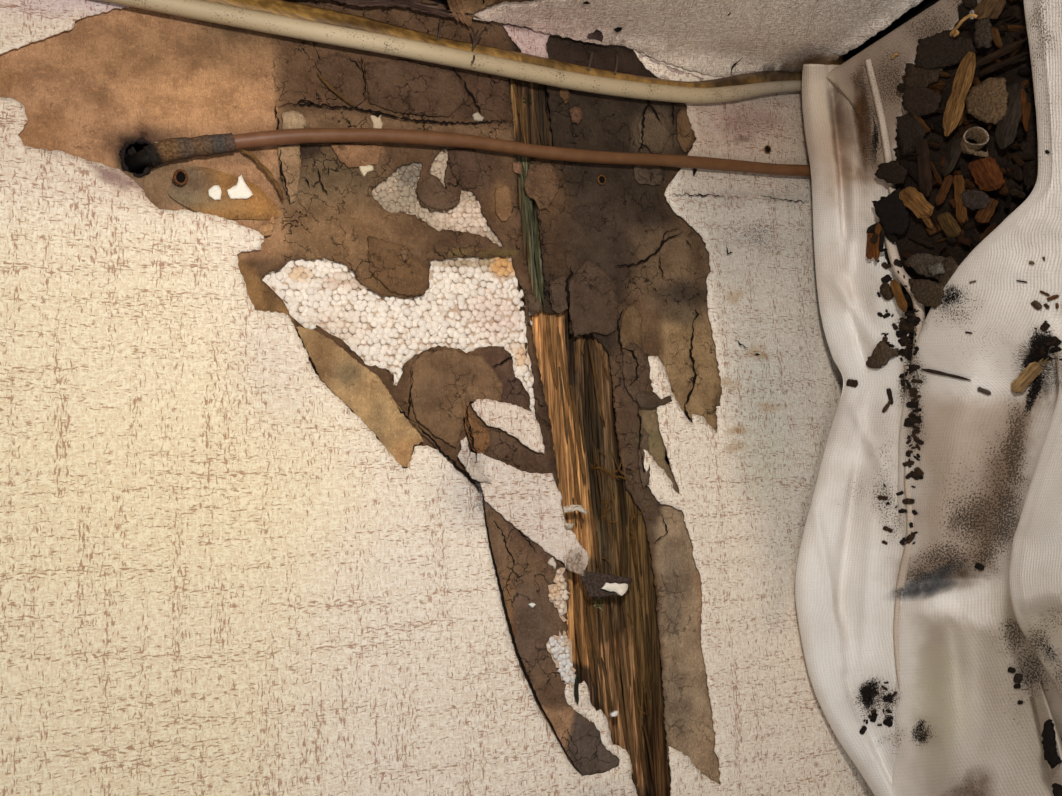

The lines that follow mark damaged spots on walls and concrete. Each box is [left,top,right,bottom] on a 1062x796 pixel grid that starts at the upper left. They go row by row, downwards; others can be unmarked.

crack [275,58,515,202]
crack [638,100,674,152]
crack [671,169,725,208]
crack [565,267,574,309]
crack [614,228,691,278]
peeling [0,0,722,784]
crack [617,310,647,488]
crack [684,309,718,423]
crack [399,371,584,776]